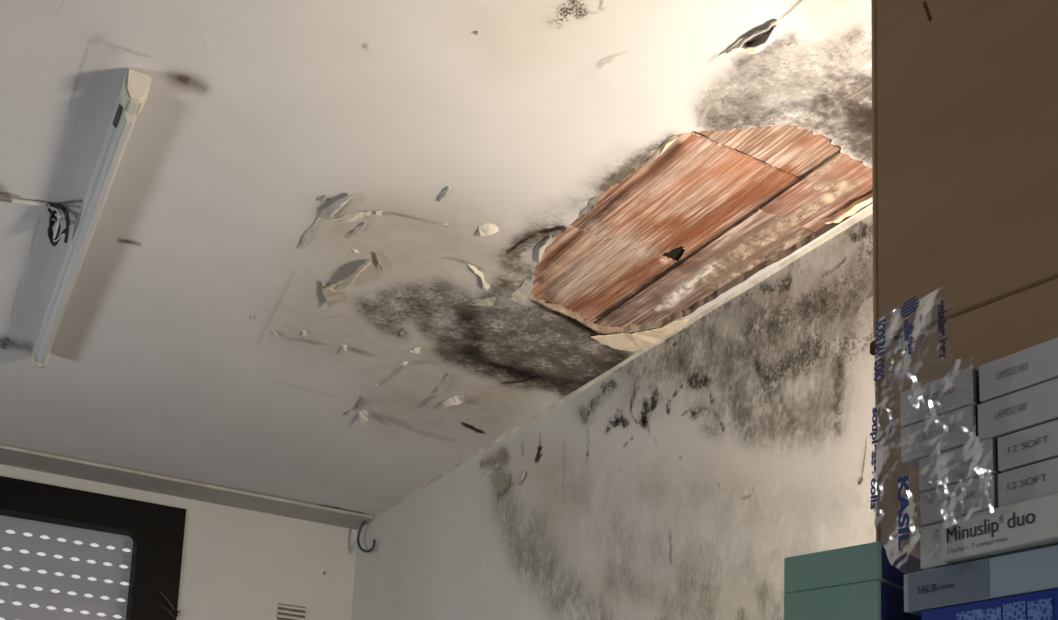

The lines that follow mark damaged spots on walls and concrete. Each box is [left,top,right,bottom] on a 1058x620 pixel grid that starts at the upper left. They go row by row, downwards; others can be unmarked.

crack [719,20,778,56]
leakage [701,32,872,164]
leakage [596,136,672,197]
peeling [300,194,383,309]
peeling [466,265,496,307]
peeling [476,223,500,237]
leakage [358,220,873,440]
flaking render [510,125,873,351]
leakage [500,494,589,610]